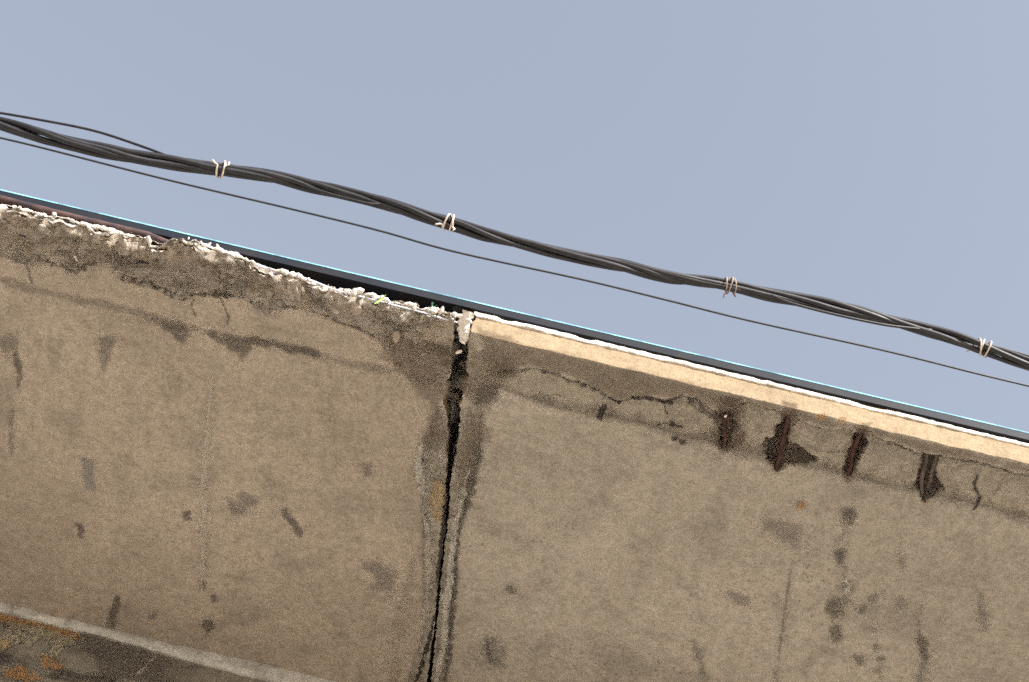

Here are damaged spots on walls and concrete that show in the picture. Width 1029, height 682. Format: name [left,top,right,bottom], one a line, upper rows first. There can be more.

spalling [0,204,463,379]
water stain [162,322,187,343]
water stain [210,332,319,358]
water stain [388,310,740,421]
crack [415,306,476,682]
crack [521,369,737,445]
corrosion [713,399,744,452]
corrosion [773,402,797,472]
corrosion [843,424,870,481]
crack [886,443,1018,511]
water stain [825,552,852,643]